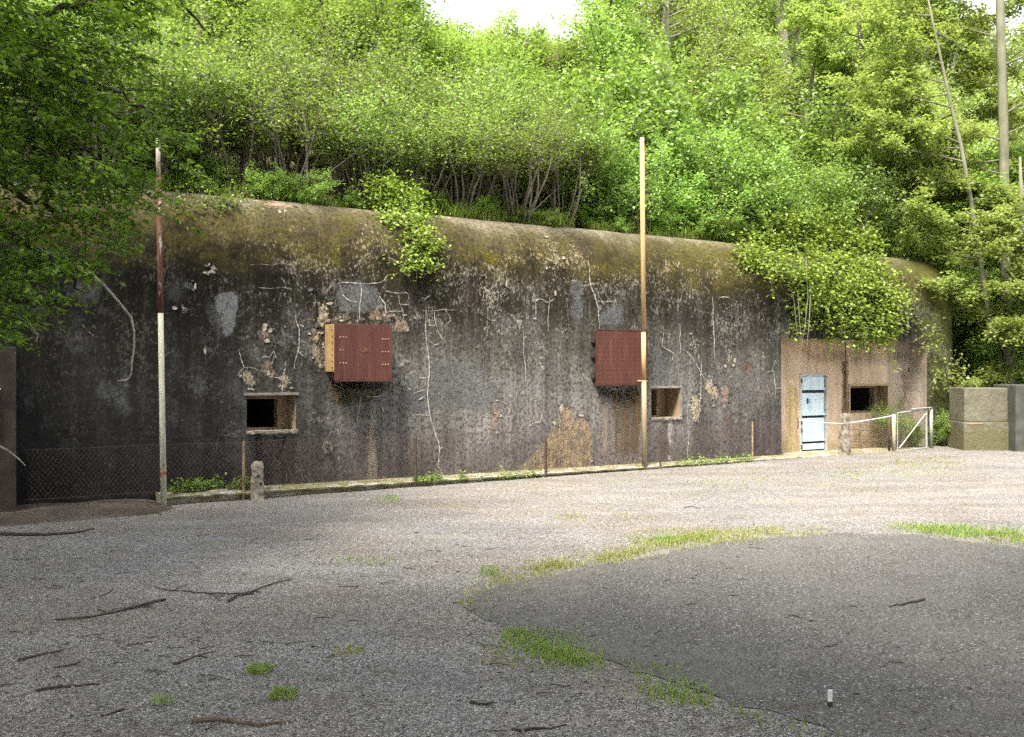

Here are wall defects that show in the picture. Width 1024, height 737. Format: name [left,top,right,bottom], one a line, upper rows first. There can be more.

spalling [259,323,273,343]
spalling [308,302,416,368]
spalling [239,362,293,390]
crack [338,275,453,475]
rust [614,391,639,452]